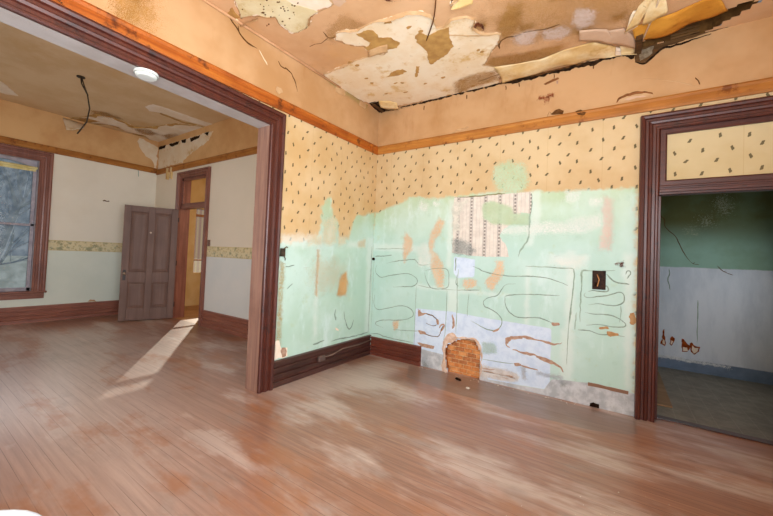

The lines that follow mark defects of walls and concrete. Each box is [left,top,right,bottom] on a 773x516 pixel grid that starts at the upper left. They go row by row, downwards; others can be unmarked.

crack [230,19,297,88]
flaking render [228,0,334,34]
flaking render [324,0,501,112]
flaking render [579,27,727,65]
flaking render [70,104,213,180]
peeling [274,340,287,360]
flaking render [418,315,483,379]
flaking render [505,336,563,372]